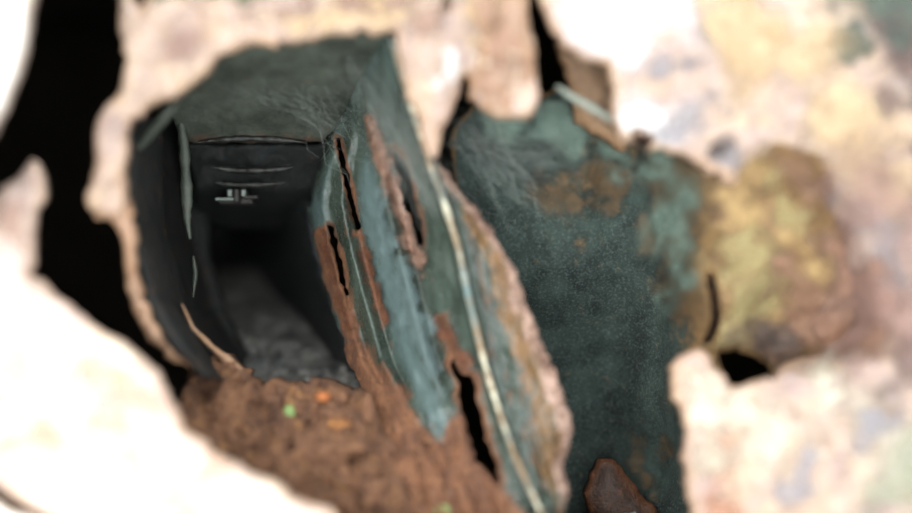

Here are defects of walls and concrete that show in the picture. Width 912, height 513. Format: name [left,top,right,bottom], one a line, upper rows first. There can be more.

spalling [631,127,653,147]
crack [707,239,721,341]